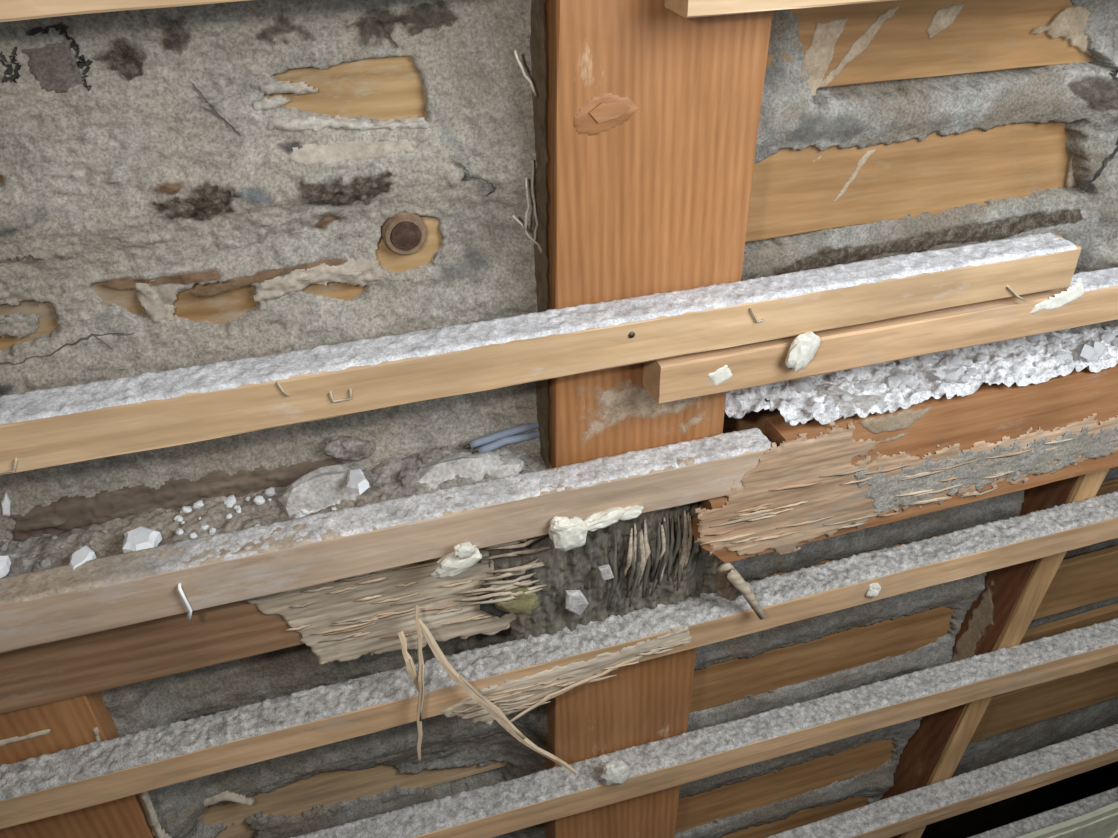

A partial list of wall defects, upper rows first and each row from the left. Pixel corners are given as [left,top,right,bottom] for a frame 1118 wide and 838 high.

flaking render [257,0,456,126]
crack [1110,67,1118,81]
flaking render [289,139,414,166]
crack [1084,143,1118,191]
flaking render [299,171,392,229]
crack [0,254,43,263]
flaking render [0,300,59,350]
flaking render [91,281,258,324]
flaking render [1,458,369,553]